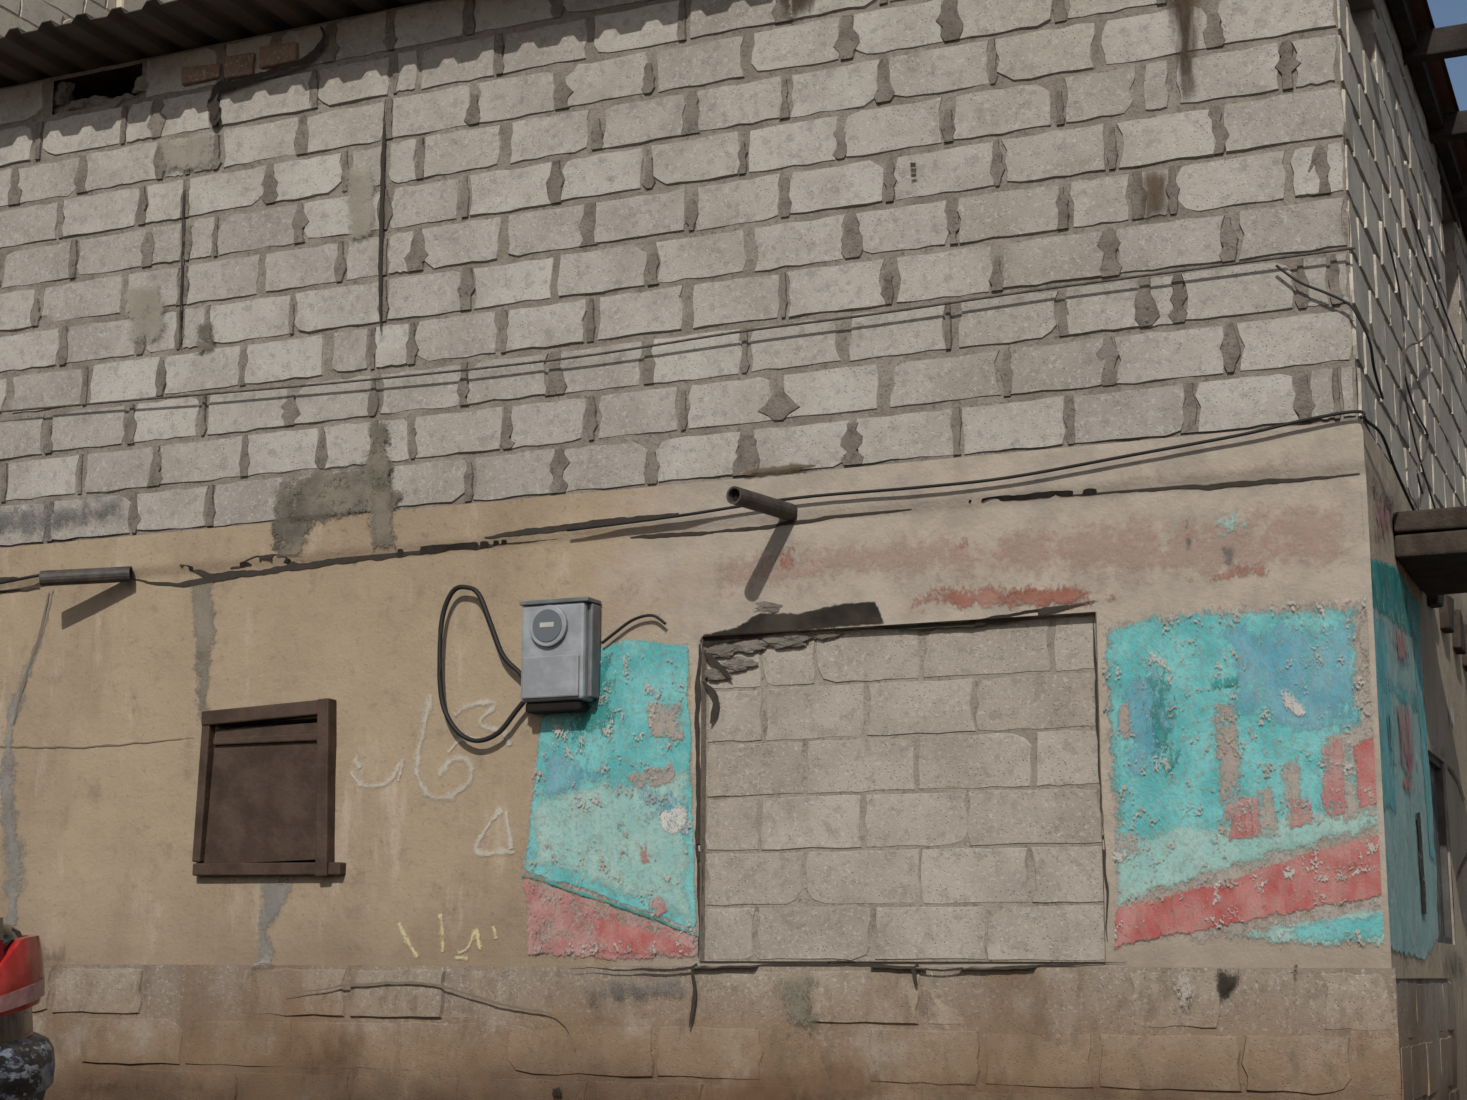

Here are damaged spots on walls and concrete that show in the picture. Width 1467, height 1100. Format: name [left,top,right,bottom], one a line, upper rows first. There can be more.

leakage [1170,0,1195,74]
leakage [1143,171,1164,215]
spalling [700,601,883,682]